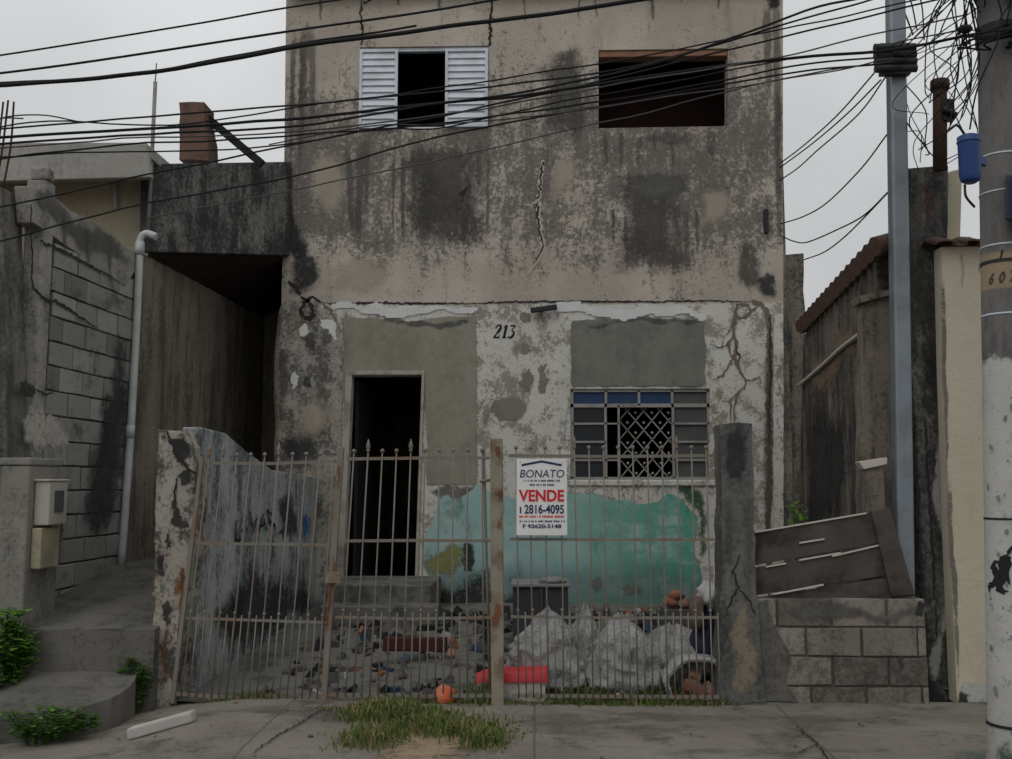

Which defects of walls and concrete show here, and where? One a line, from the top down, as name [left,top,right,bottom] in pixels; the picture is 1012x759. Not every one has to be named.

damp [290,207,318,293]
damp [347,144,369,231]
damp [392,145,490,242]
crack [525,159,545,275]
damp [612,131,699,269]
spalling [491,363,549,421]
crack [287,281,762,422]
damp [85,339,128,533]
spalling [170,438,192,485]
spalling [156,501,188,576]
spalling [162,573,183,626]
crack [724,555,756,619]